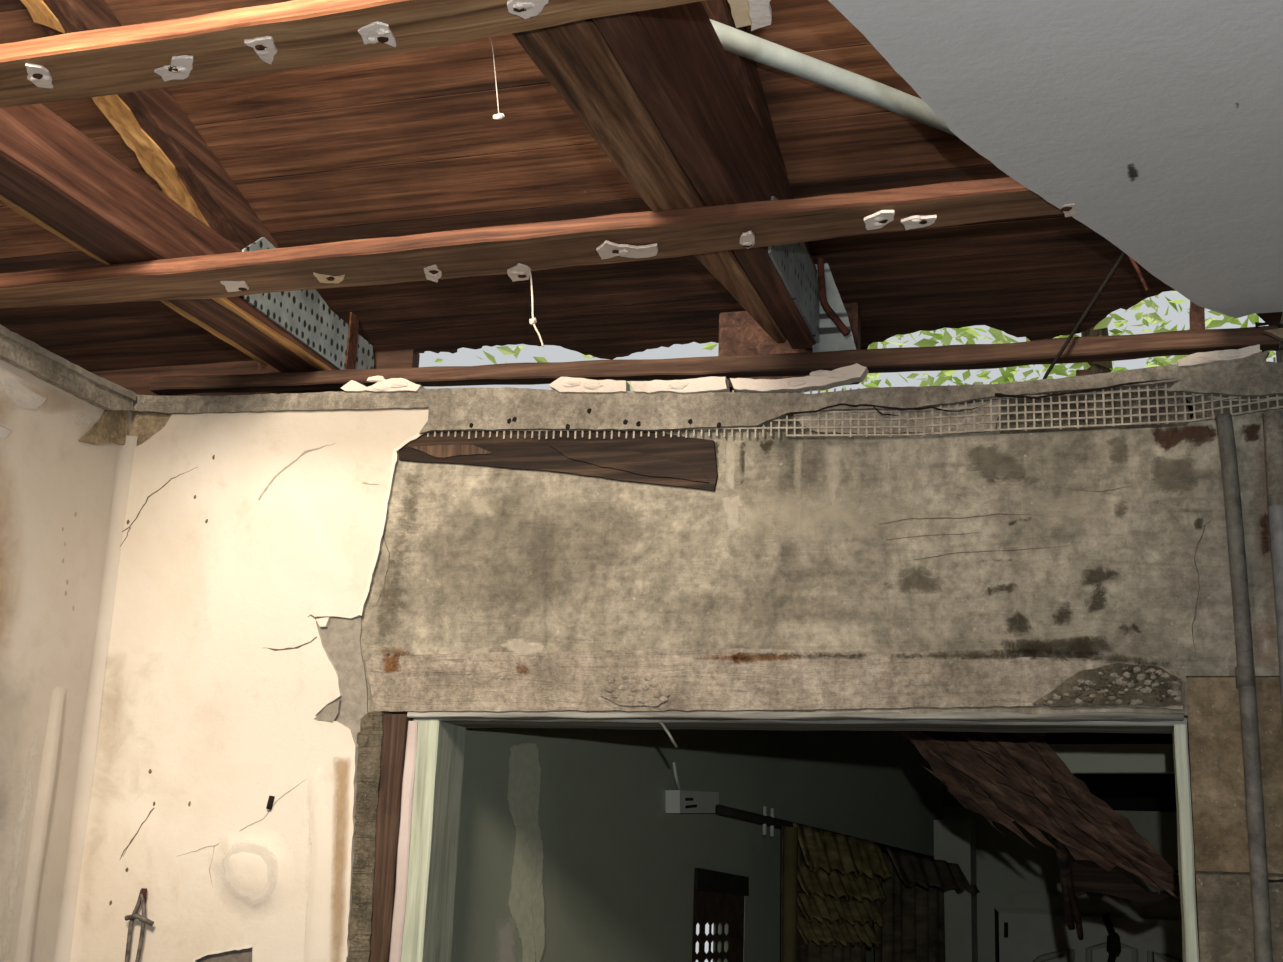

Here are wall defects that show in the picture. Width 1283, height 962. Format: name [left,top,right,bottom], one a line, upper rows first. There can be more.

crack [258,443,335,501]
water stain [740,440,773,472]
rust [1151,425,1216,450]
rust [1243,424,1260,441]
crack [120,467,197,546]
flaking render [268,433,422,748]
mould [1084,567,1117,611]
rust [712,653,794,663]
mould [898,607,1168,665]
spalling [1032,663,1183,707]
crack [120,808,154,859]
flaking render [193,945,253,962]